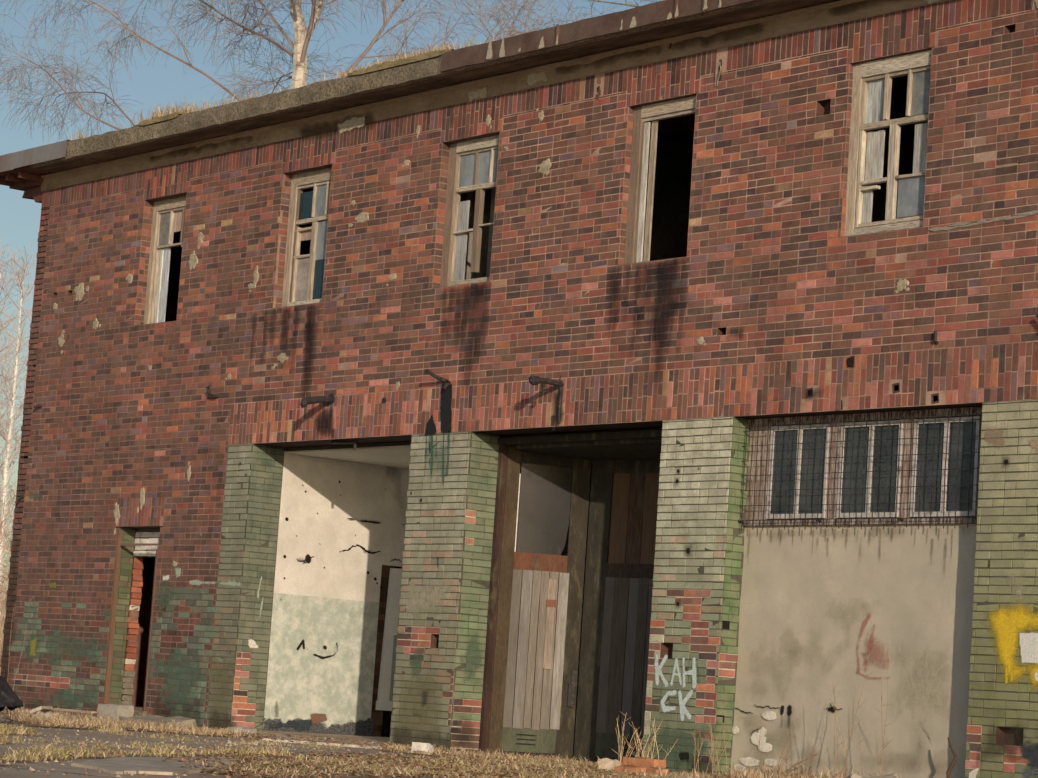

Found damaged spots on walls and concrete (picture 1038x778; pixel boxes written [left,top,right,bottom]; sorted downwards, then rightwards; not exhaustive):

peeling [486,36,505,59]
leakage [317,412,332,433]
spalling [644,589,794,775]